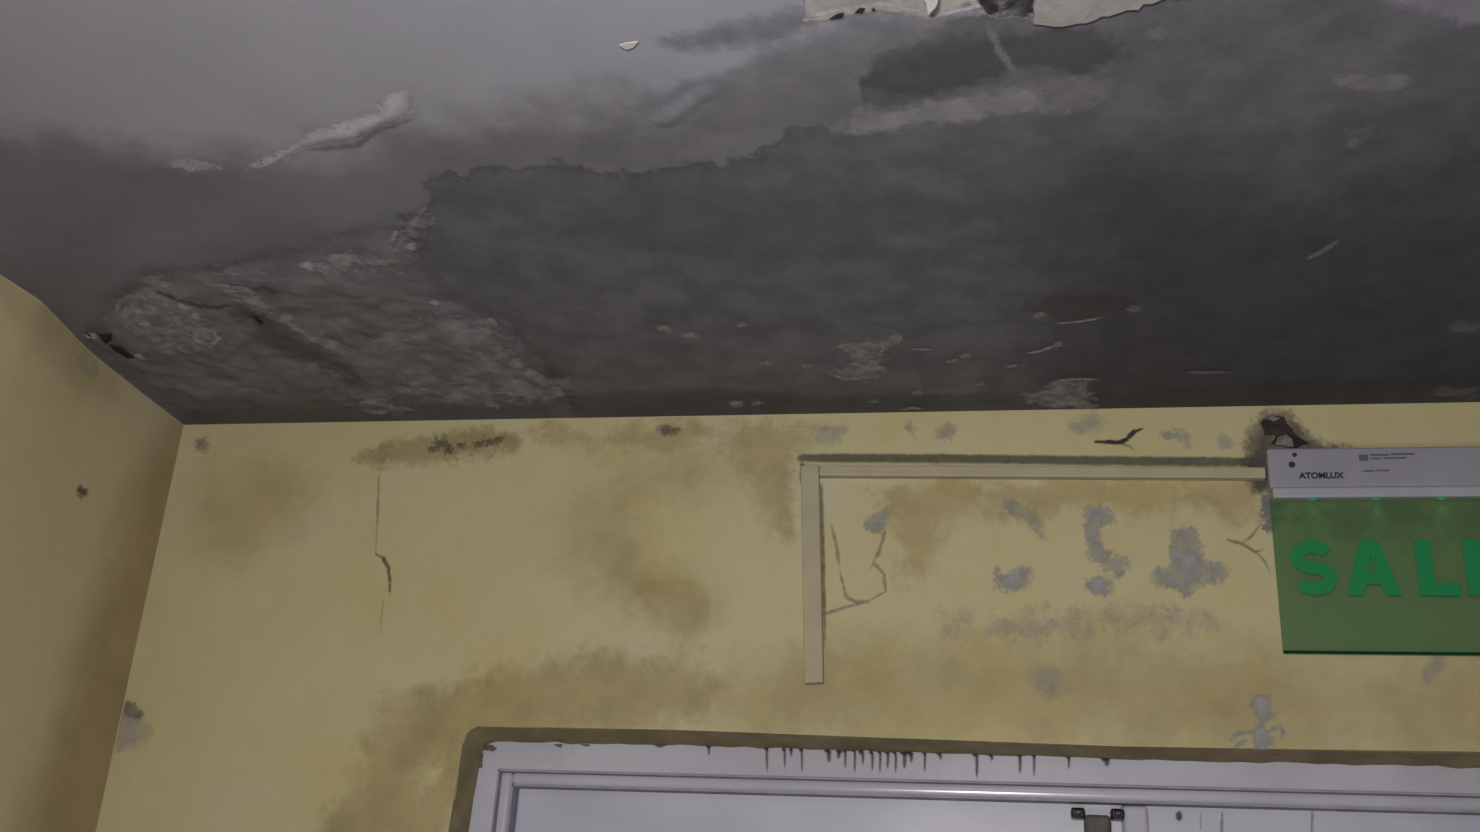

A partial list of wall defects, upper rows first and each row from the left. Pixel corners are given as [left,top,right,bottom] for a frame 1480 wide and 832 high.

spalling [803,0,1160,27]
peeling [251,90,415,169]
damp [0,0,1480,435]
damp [370,407,518,462]
crack [1094,428,1142,444]
crack [377,555,391,592]
peeling [1084,508,1124,597]
peeling [1156,527,1225,596]
damp [330,681,537,832]